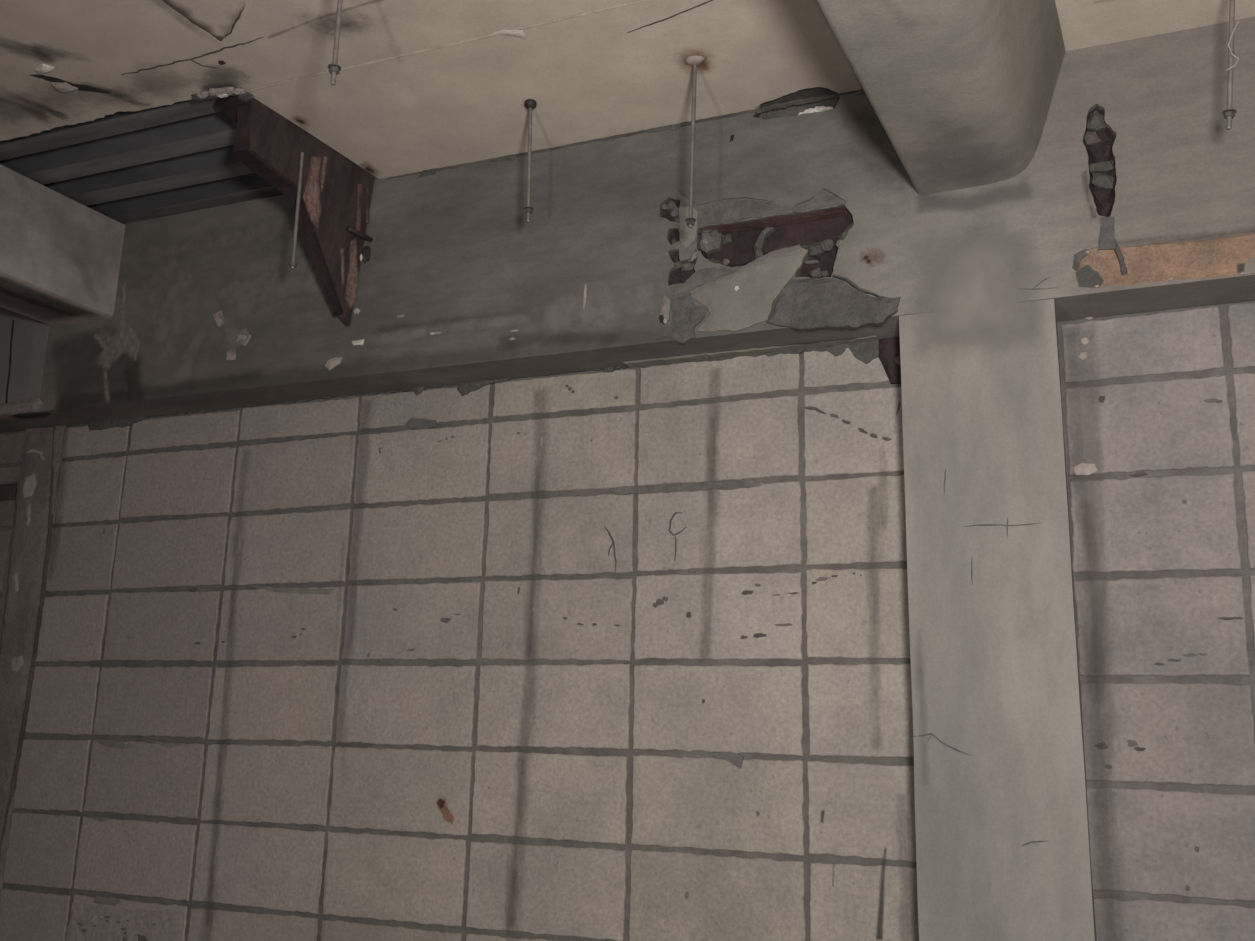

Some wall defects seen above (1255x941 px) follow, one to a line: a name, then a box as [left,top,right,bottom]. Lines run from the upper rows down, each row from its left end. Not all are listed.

spalling [754,87,839,119]
spalling [659,188,901,344]
spalling [1072,107,1255,288]